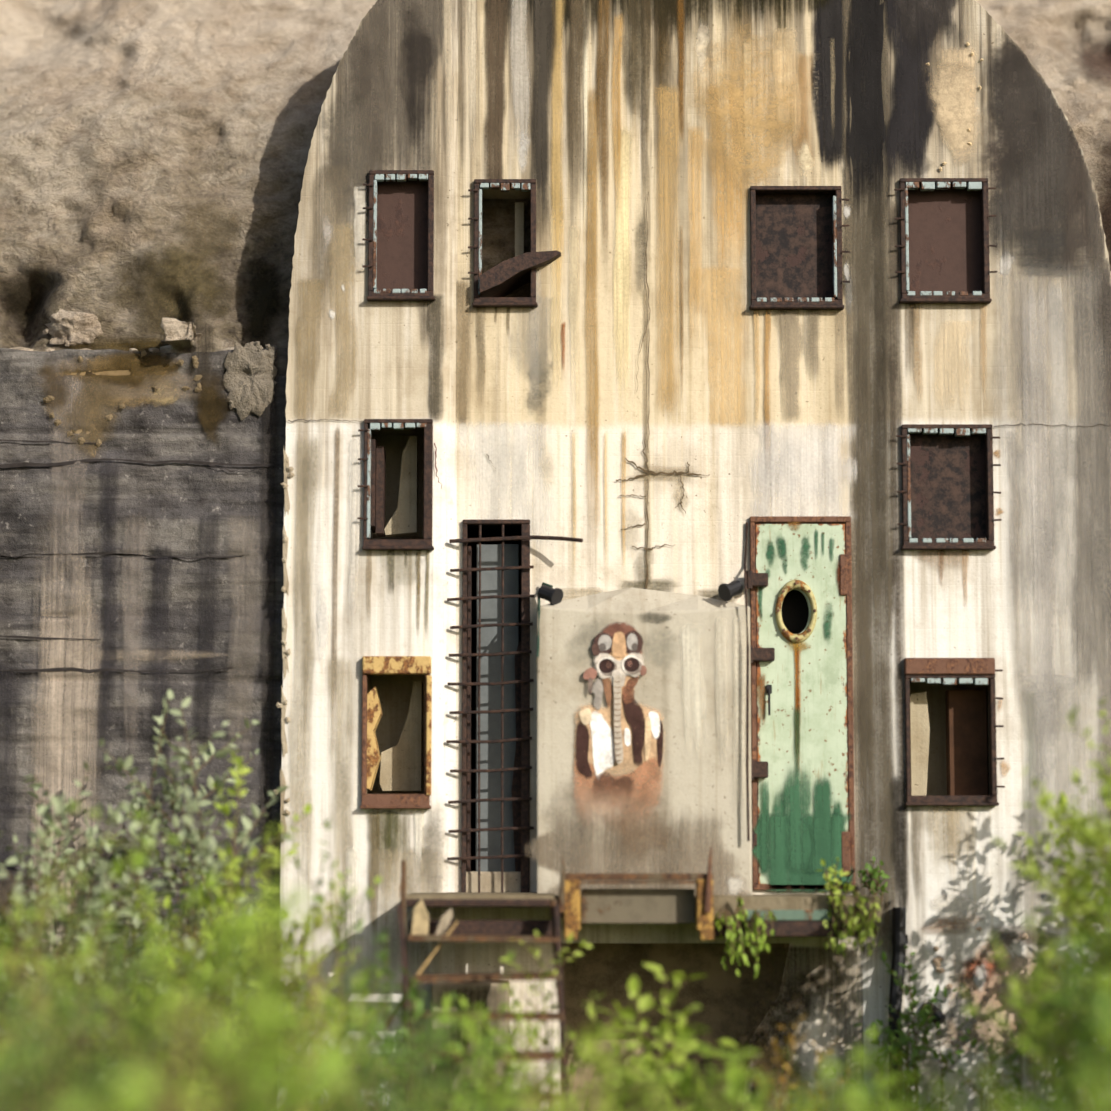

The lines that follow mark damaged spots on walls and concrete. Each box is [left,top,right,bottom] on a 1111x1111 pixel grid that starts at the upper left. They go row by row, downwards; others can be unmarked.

leakage [29,326,221,964]
spalling [43,341,277,456]
leakage [229,349,278,834]
corrosion [552,0,563,251]
corrosion [586,93,607,530]
leakage [292,0,976,1109]
crack [616,192,710,589]
corrosion [659,0,702,405]
peeling [759,538,787,616]
peeling [752,771,852,892]
peeling [801,531,834,569]
leakage [975,965,985,986]